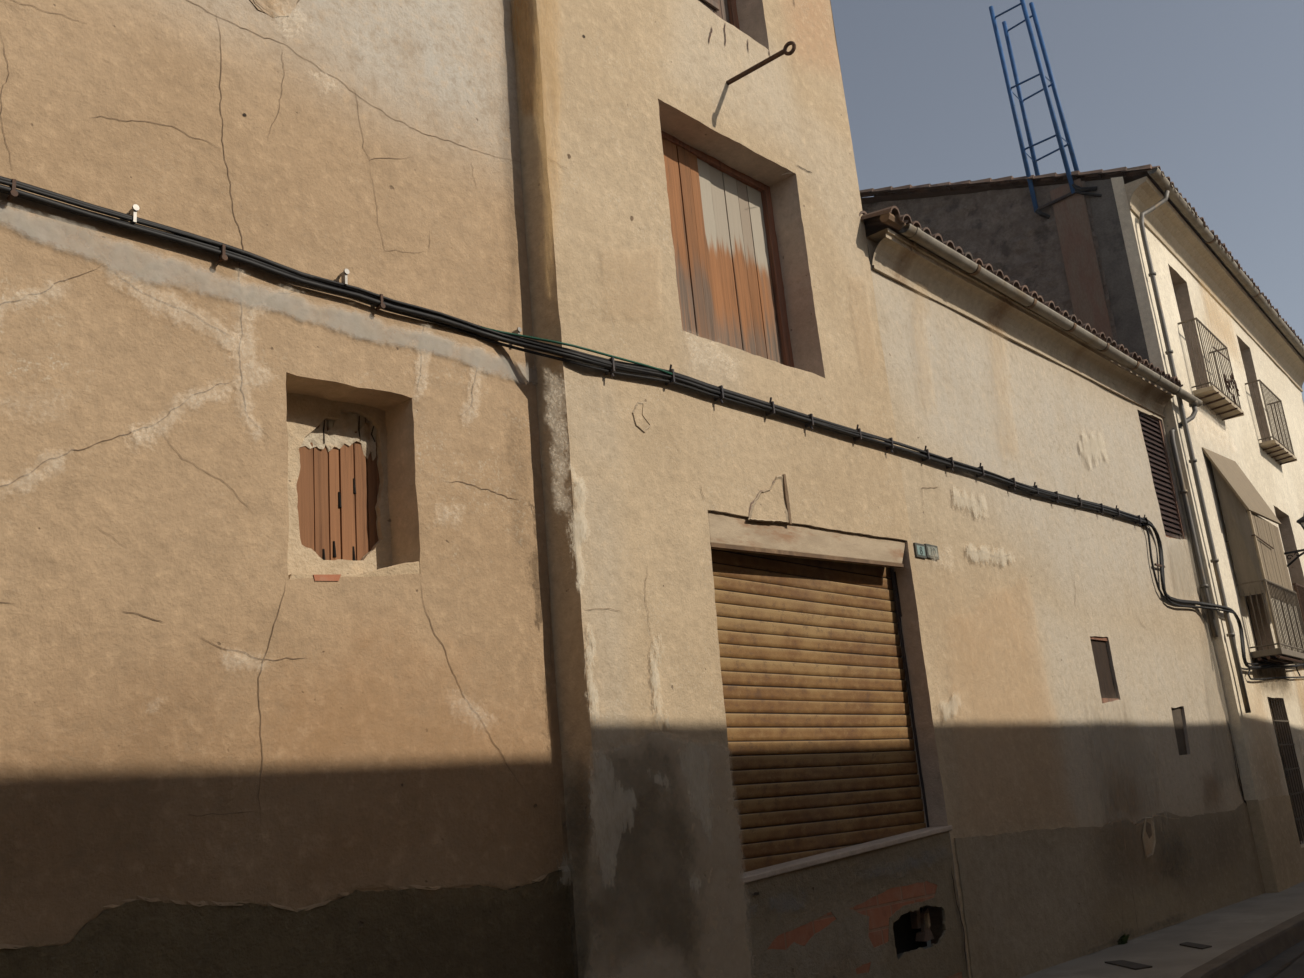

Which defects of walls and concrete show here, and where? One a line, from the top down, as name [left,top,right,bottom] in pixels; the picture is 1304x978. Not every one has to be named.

crack [0,0,567,504]
crack [190,583,310,816]
spalling [893,907,934,954]